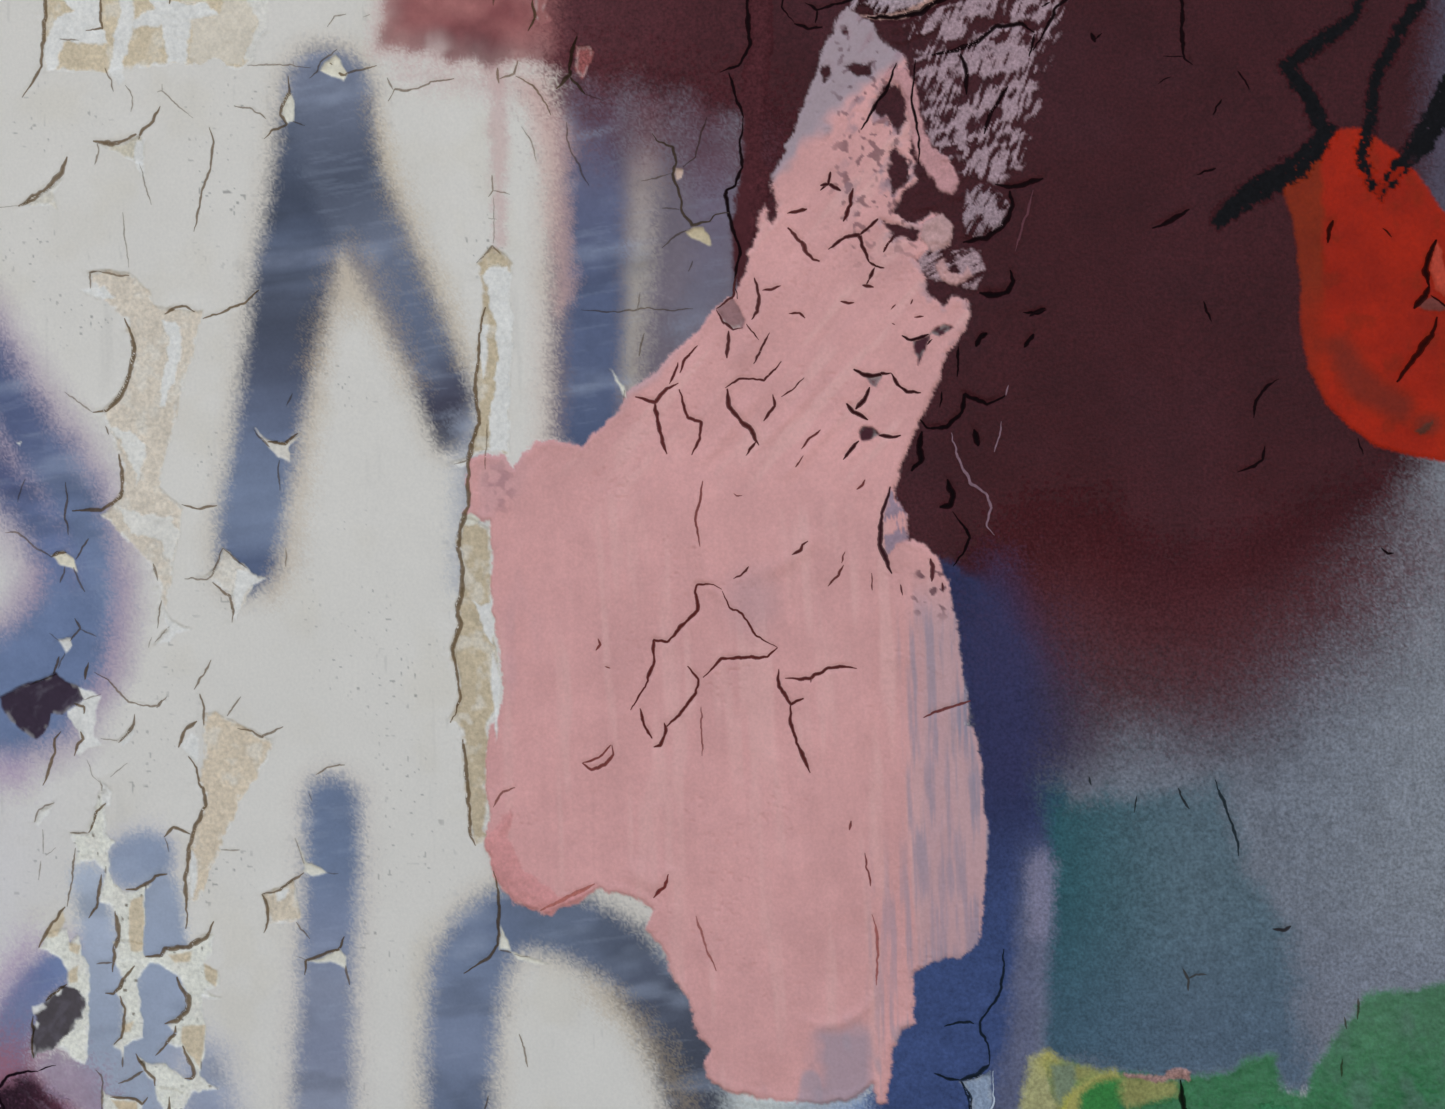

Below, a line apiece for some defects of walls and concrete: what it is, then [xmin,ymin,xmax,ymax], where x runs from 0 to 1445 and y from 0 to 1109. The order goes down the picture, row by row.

peeling [22,0,377,139]
crack [721,0,946,325]
crack [861,0,1067,164]
crack [1396,239,1445,383]
peeling [5,531,89,592]
peeling [65,268,264,648]
peeling [448,245,516,847]
crack [635,345,804,546]
crack [828,332,1006,595]
crack [630,566,857,773]
peeling [0,619,282,1109]
peeling [464,871,549,974]